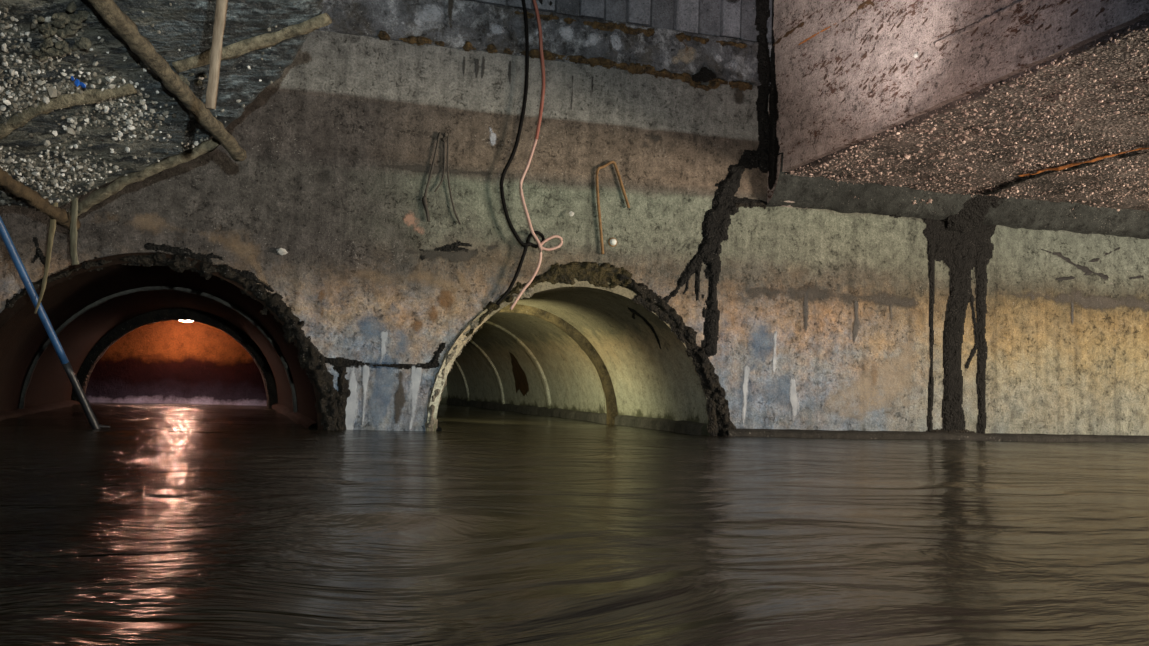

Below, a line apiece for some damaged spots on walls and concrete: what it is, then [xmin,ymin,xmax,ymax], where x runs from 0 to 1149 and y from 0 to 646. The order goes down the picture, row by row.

rust [377,31,446,47]
rust [462,41,752,91]
crack [733,0,780,209]
leakage [741,195,1004,433]
leakage [345,318,422,430]
crack [325,343,445,430]